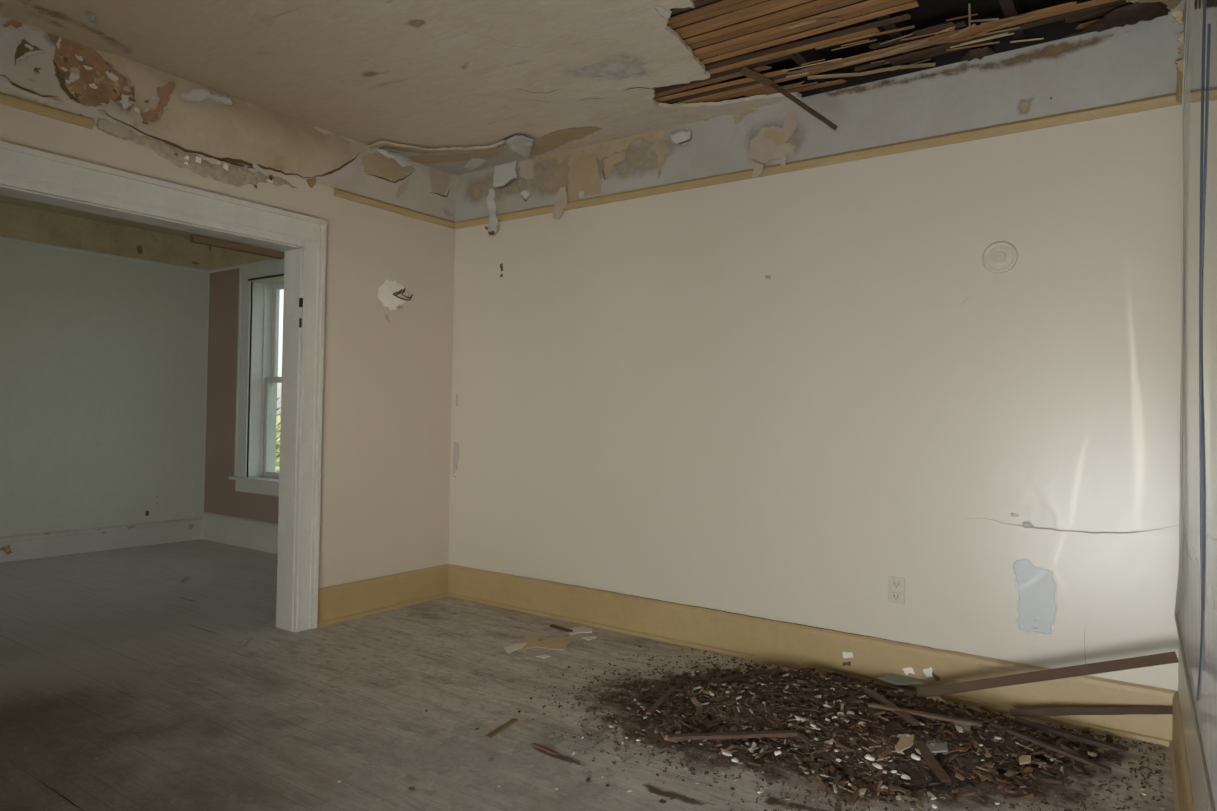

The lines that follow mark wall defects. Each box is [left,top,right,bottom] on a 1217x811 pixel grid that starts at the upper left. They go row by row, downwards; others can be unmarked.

flaking render [1126,0,1184,70]
peeling [0,36,298,189]
peeling [348,127,602,235]
spalling [377,279,413,310]